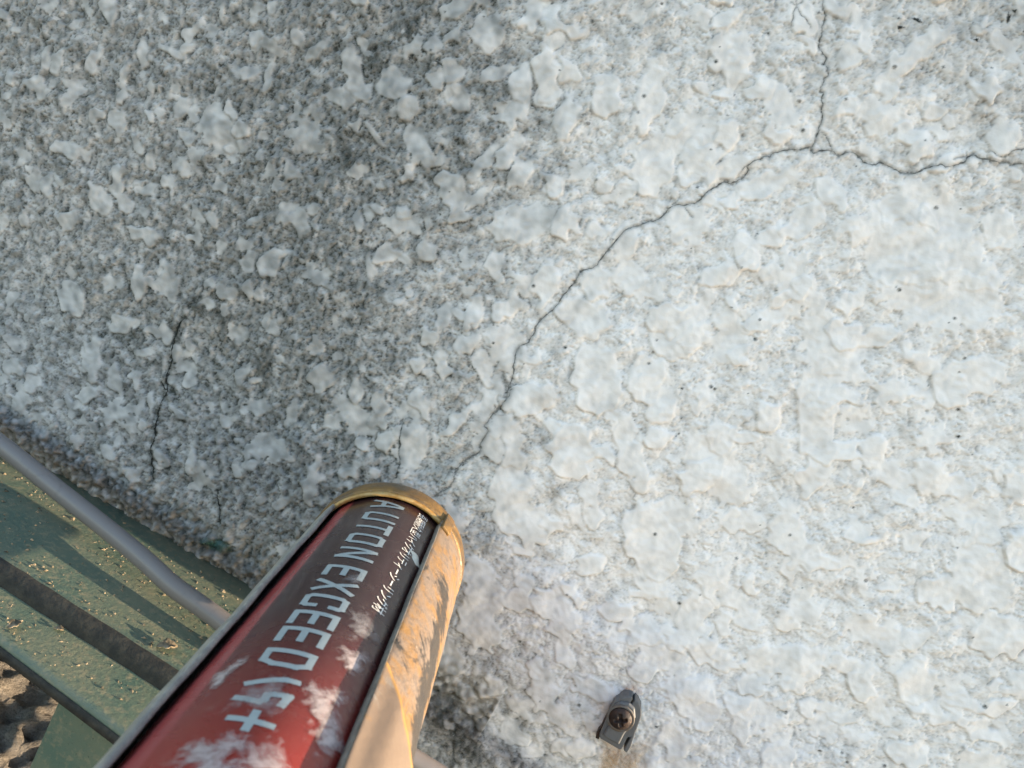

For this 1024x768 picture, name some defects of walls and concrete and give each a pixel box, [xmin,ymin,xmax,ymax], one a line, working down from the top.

crack [150,321,182,477]
crack [437,3,1023,495]